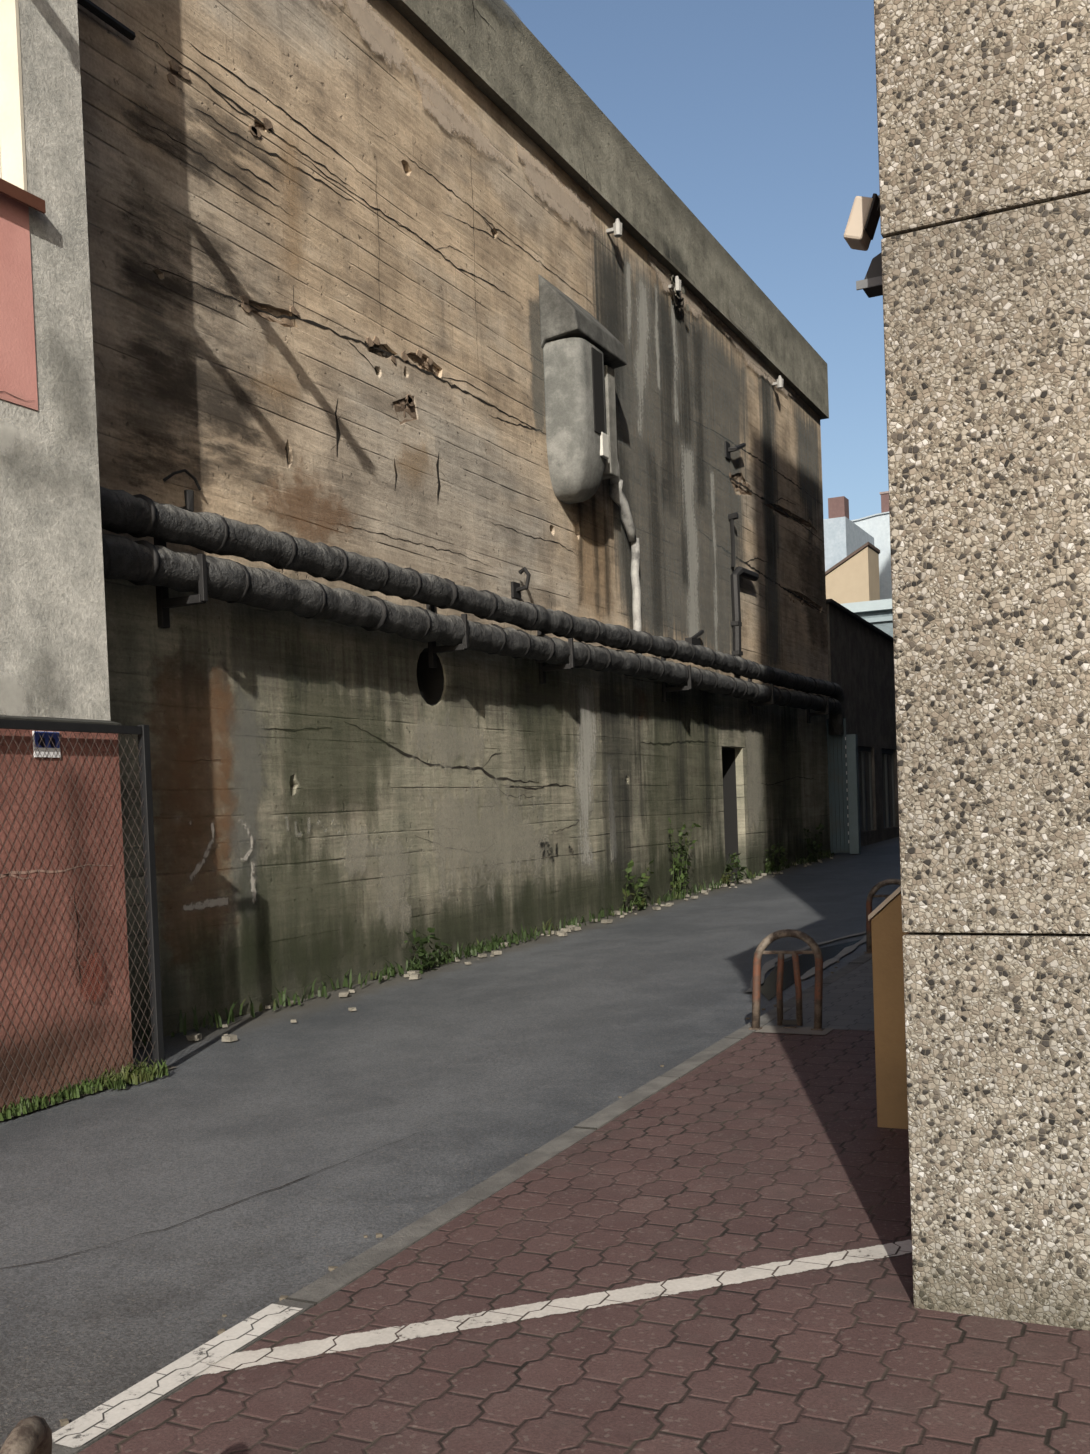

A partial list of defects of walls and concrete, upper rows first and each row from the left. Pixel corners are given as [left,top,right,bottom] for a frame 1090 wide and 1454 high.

crack [139,31,601,434]
damp [594,237,780,668]
damp [796,411,820,522]
damp [232,697,264,917]
crack [265,721,593,832]
damp [575,681,617,864]